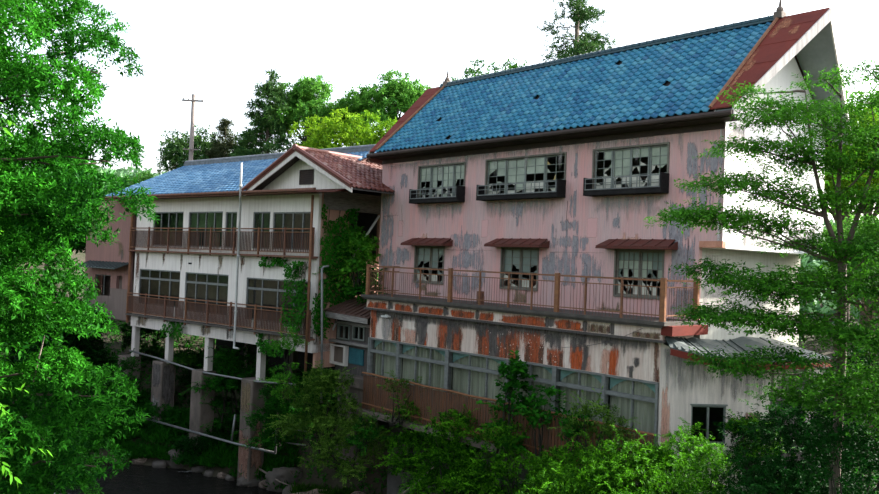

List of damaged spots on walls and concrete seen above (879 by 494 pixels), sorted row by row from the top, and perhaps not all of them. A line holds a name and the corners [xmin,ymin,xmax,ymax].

peeling [450,228,485,295]
peeling [541,190,603,288]
peeling [662,142,723,315]
corrosion [367,301,610,371]
corrosion [602,348,619,375]
damp [660,349,707,447]